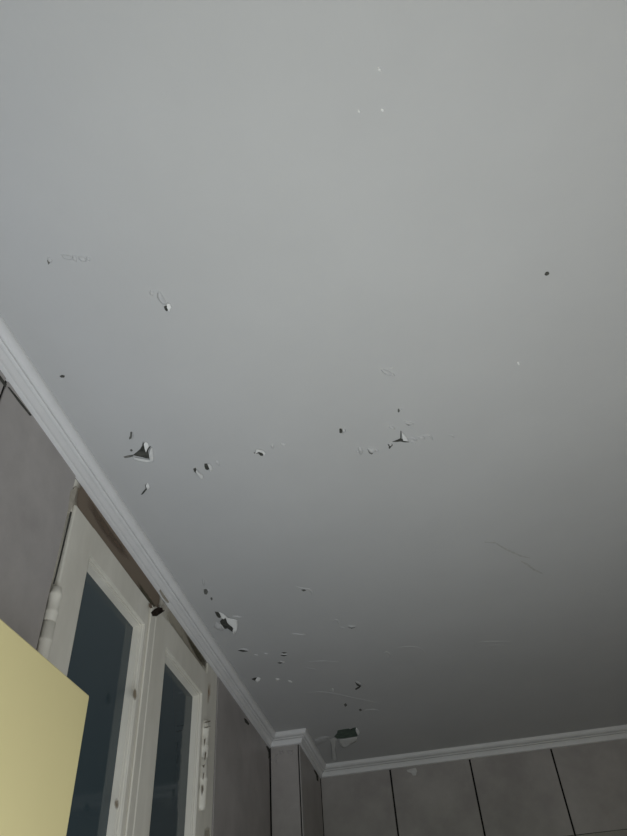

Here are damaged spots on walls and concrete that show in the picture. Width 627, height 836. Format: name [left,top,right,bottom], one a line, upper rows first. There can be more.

peeling [124,432,154,462]
peeling [214,612,242,635]
peeling [329,727,360,761]